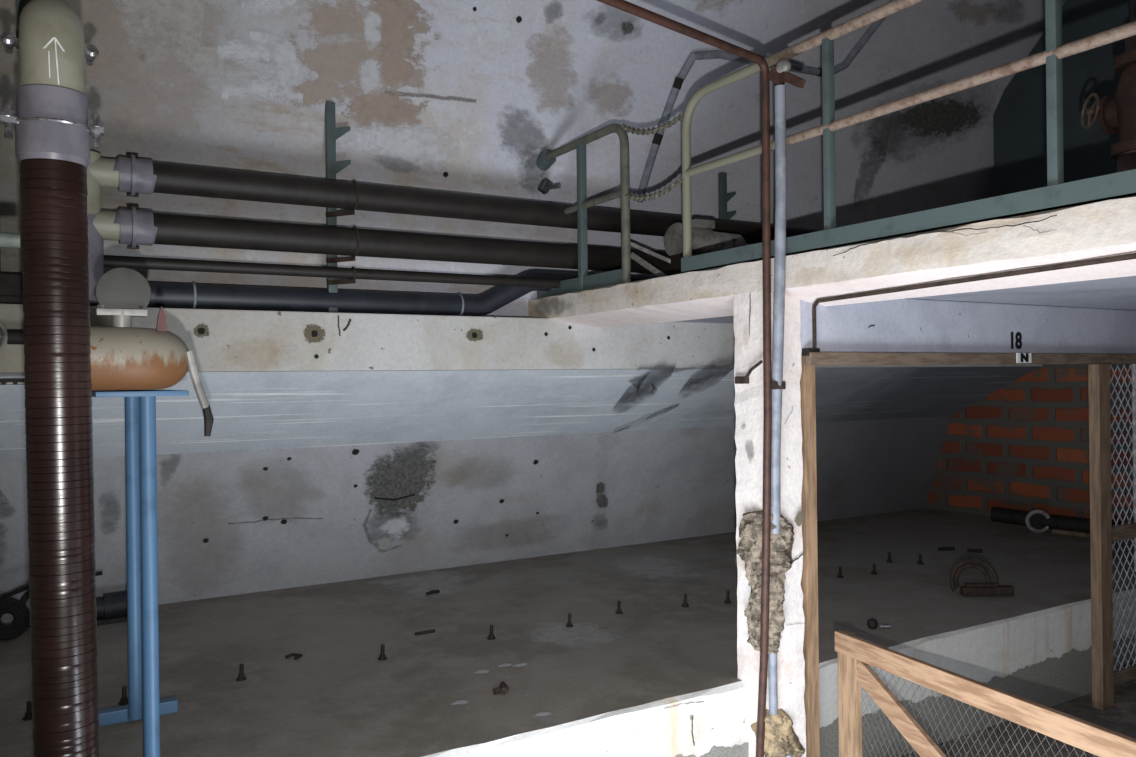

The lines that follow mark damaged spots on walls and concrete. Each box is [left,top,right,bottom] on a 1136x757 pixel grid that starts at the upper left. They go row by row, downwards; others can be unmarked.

peeling [289,0,438,129]
damp [895,99,981,138]
crack [833,215,1057,256]
spalling [737,510,805,654]
peeling [982,645,1092,707]
peeling [1113,635,1135,669]
spalling [676,709,805,757]
peeling [820,718,839,757]
peeling [862,710,916,757]
peeling [900,694,1009,744]